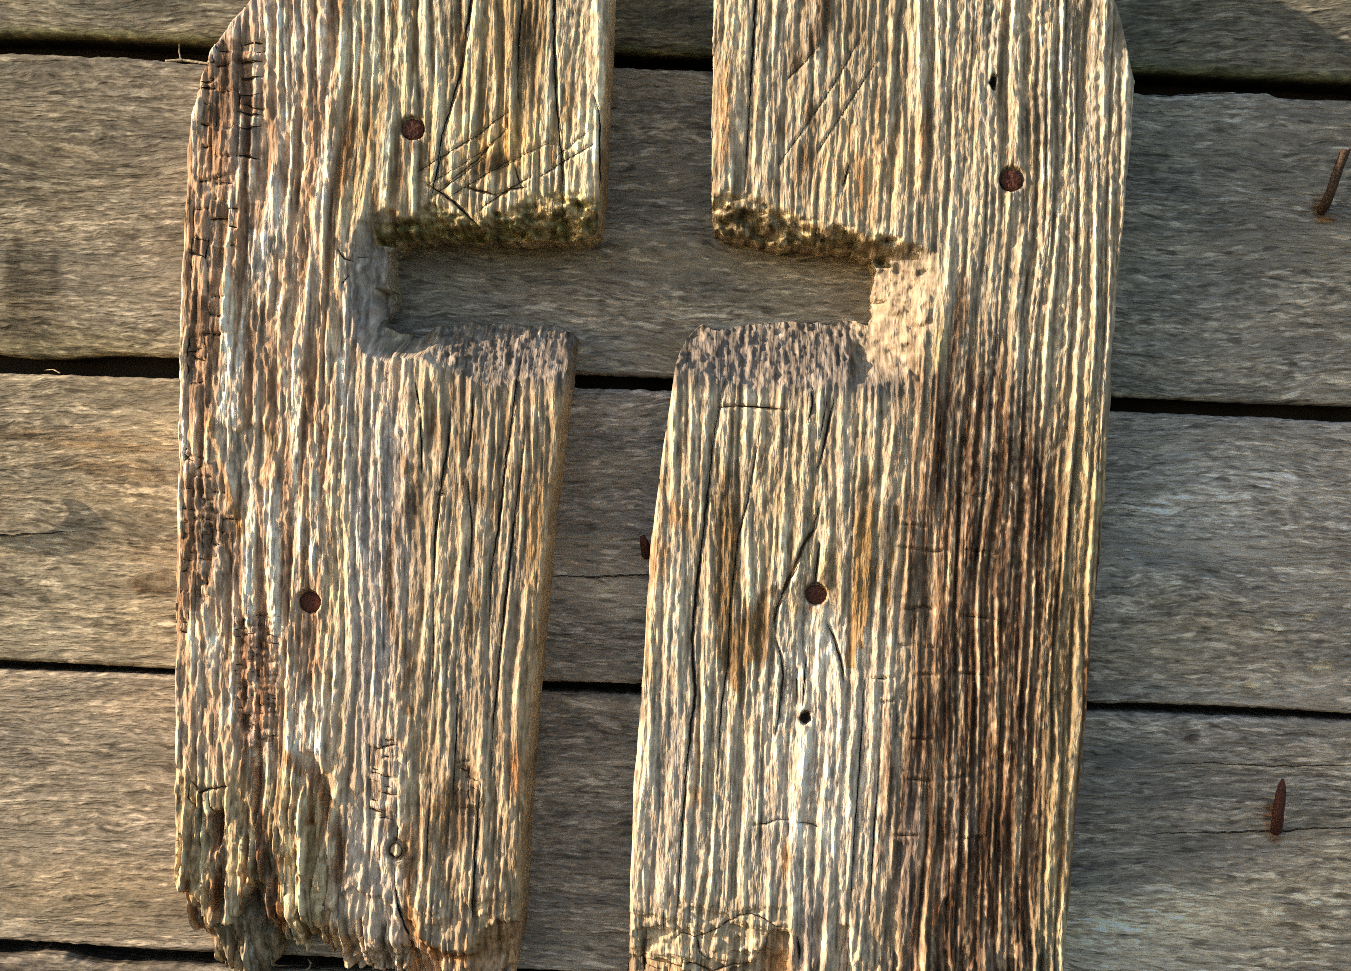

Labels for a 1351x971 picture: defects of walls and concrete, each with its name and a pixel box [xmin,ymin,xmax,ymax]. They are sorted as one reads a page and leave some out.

crack [430,0,527,229]
crack [517,0,564,213]
crack [593,97,601,193]
damp [940,283,965,368]
crack [369,355,525,934]
crack [643,388,834,971]
damp [888,574,1034,809]
damp [927,368,1024,564]
damp [1035,466,1061,578]
damp [1038,574,1063,649]
damp [919,774,1046,971]